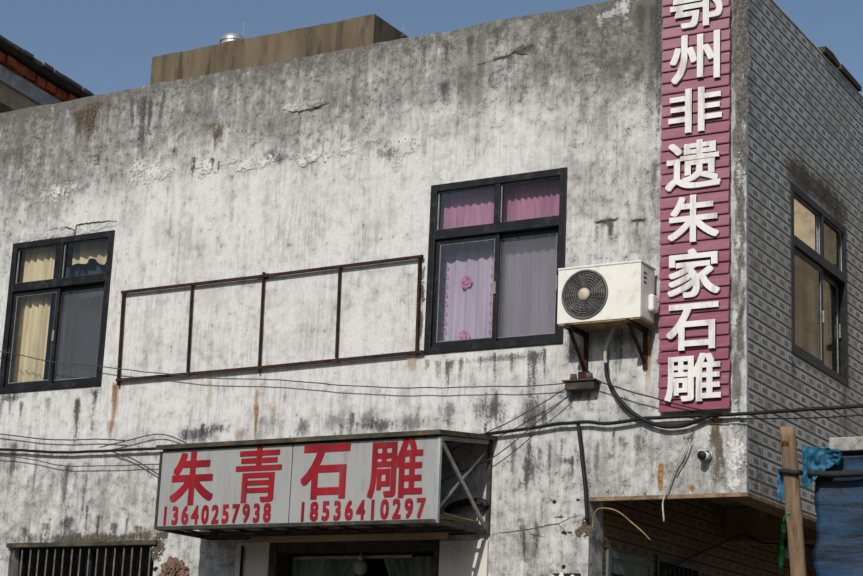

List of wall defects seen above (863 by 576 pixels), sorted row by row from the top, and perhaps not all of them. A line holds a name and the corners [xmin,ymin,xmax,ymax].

peeling [597,0,633,27]
water stain [72,100,110,135]
peeling [283,101,317,113]
peeling [128,157,174,187]
peeling [192,154,274,179]
crack [46,220,116,235]
water stain [482,349,574,487]
water stain [181,424,223,443]
water stain [520,523,539,562]